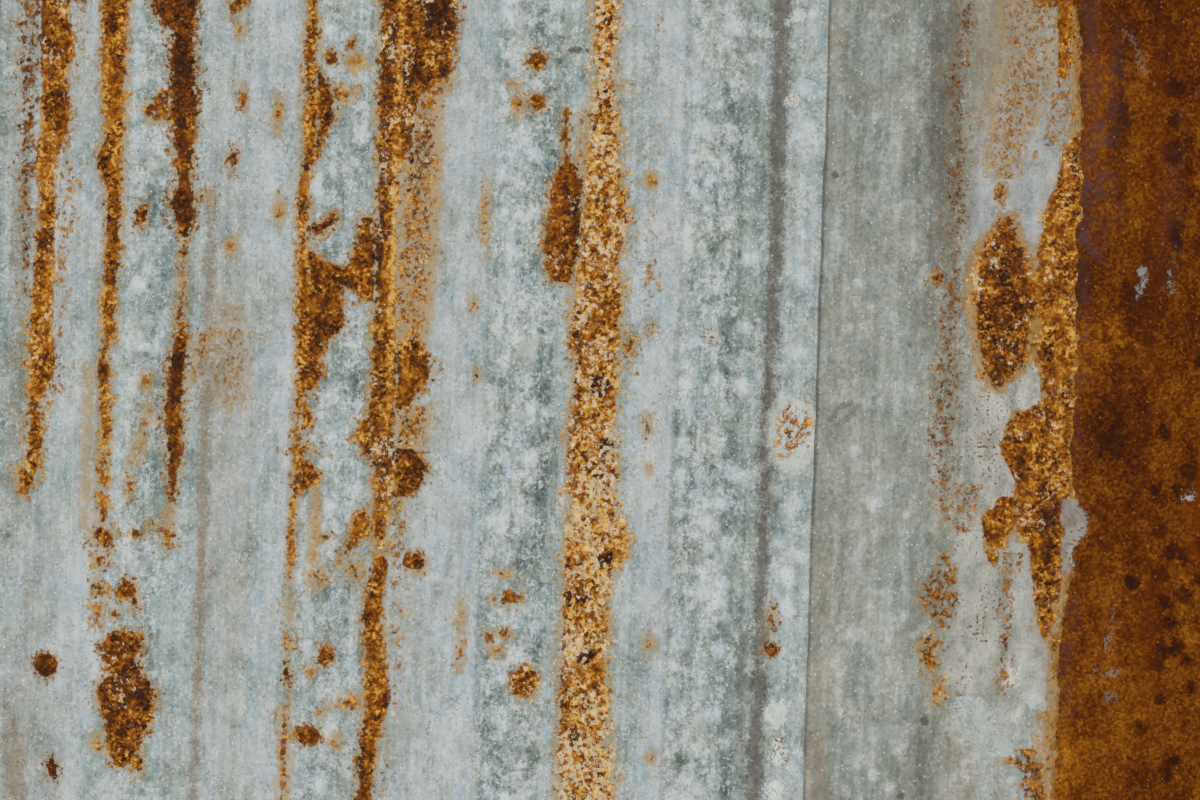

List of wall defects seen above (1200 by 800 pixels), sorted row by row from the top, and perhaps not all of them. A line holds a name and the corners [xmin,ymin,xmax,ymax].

rust [3,0,469,800]
rust [449,0,665,800]
rust [760,385,816,478]
rust [908,0,1200,800]